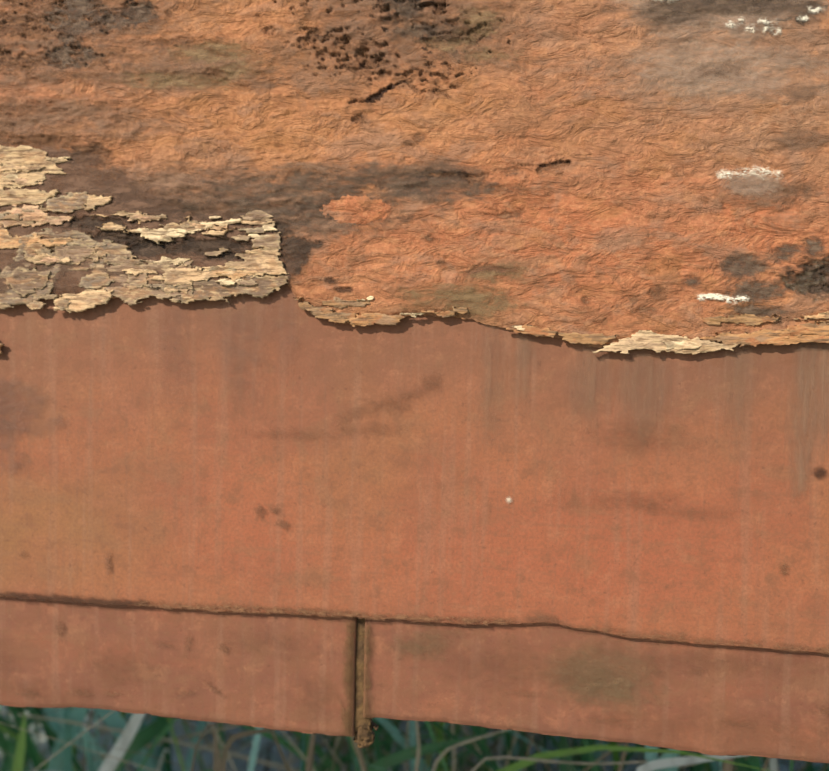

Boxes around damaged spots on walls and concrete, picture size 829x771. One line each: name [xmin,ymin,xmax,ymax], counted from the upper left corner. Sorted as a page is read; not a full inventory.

damp [634,0,821,34]
damp [641,42,818,96]
damp [0,102,495,297]
peeling [0,145,290,313]
peeling [293,278,468,327]
peeling [506,311,829,355]